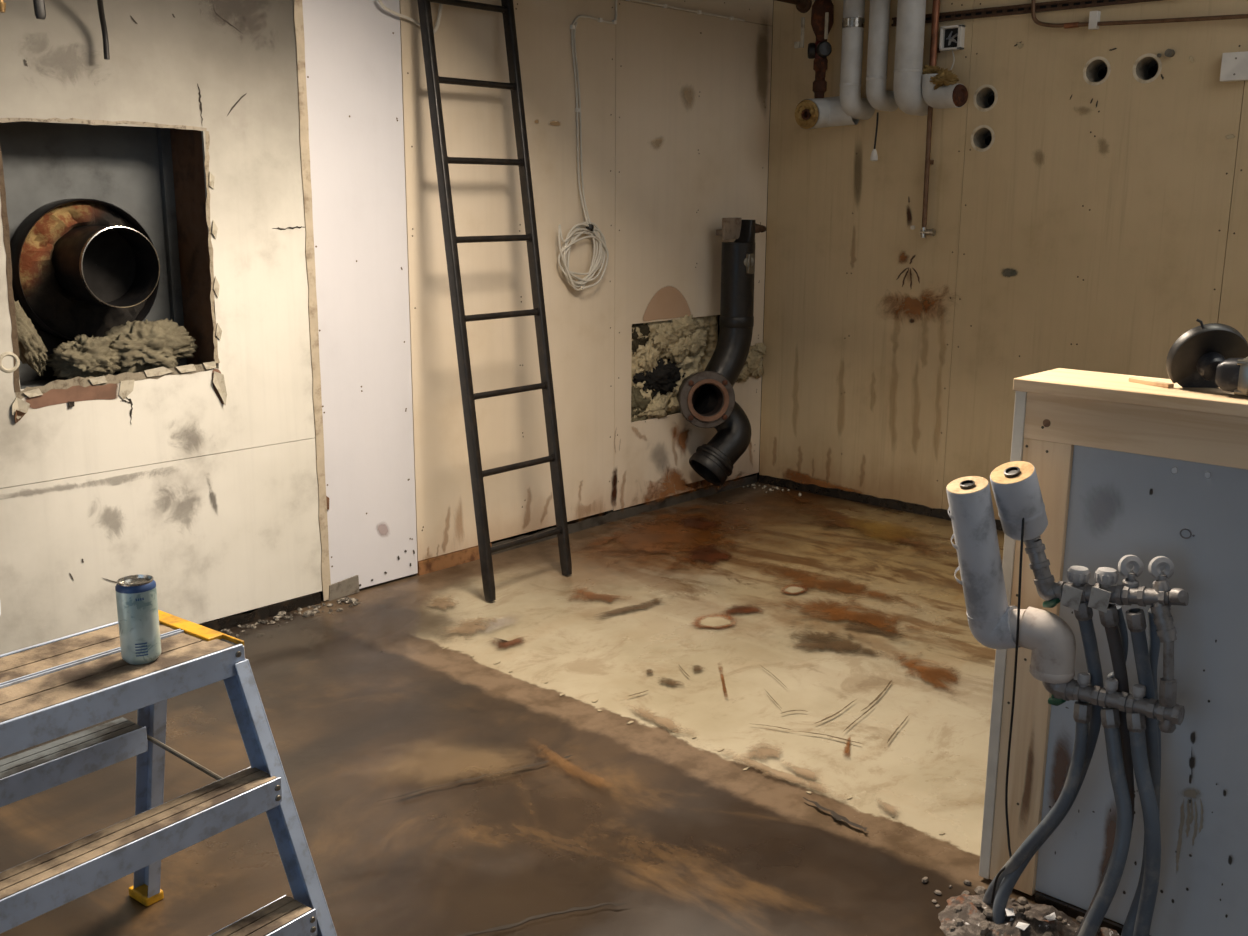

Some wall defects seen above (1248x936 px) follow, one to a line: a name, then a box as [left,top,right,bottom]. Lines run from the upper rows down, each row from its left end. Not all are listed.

rust [885,252,942,323]
spalling [632,358,686,399]